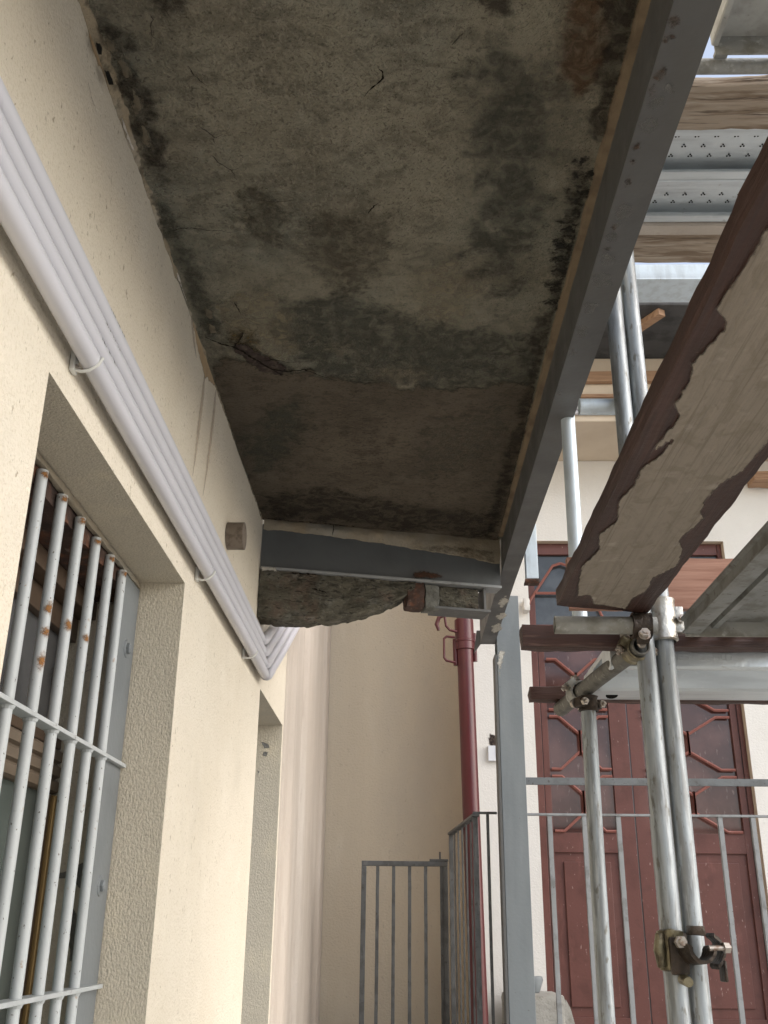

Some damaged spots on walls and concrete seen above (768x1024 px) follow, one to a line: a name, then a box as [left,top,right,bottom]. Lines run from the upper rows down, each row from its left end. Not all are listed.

damp [479,0,510,15]
damp [85,19,166,170]
damp [451,51,564,296]
crack [206,302,332,380]
damp [154,156,595,538]